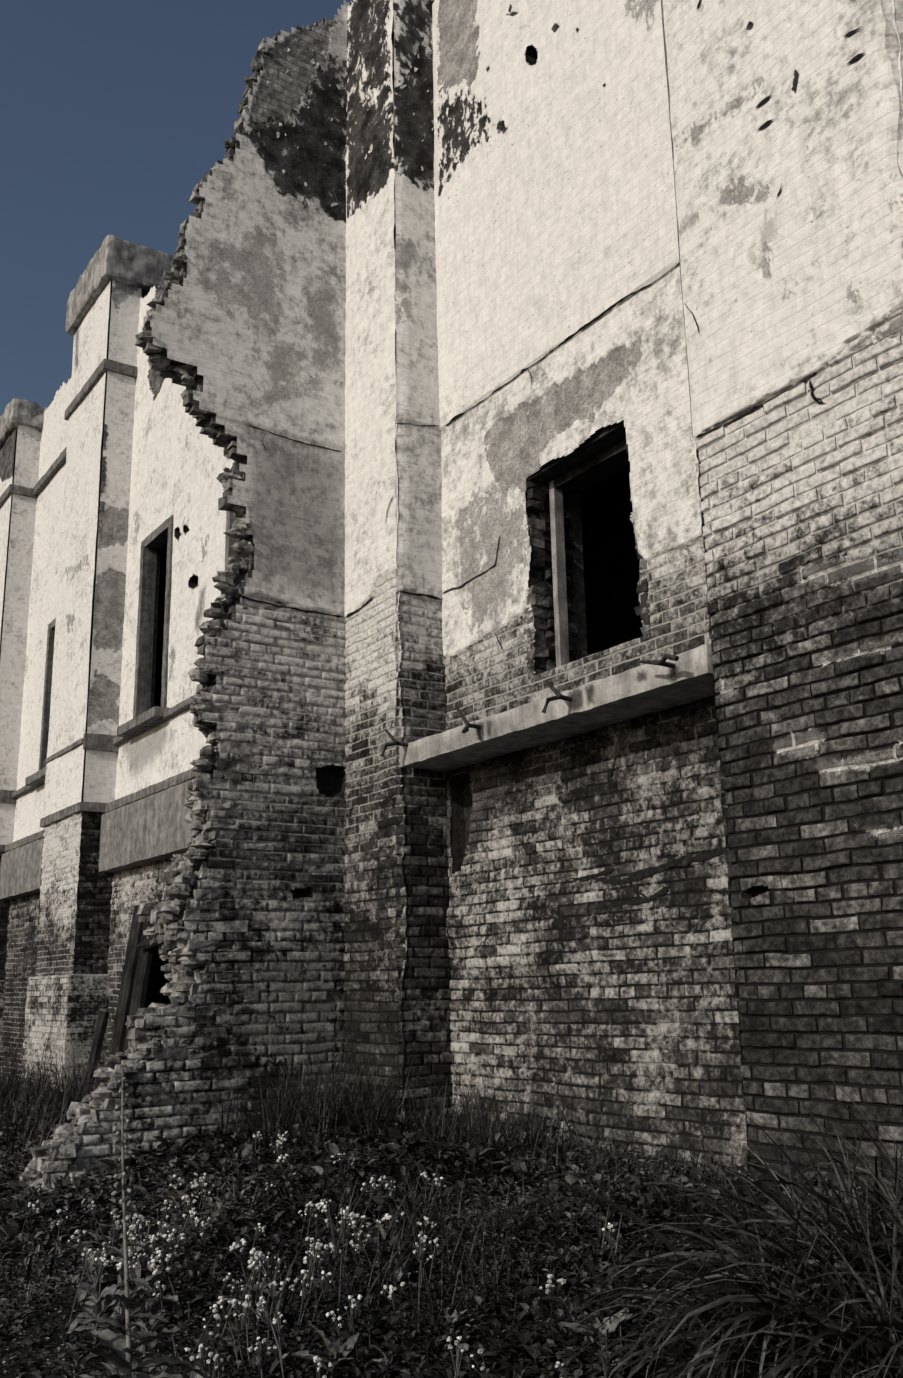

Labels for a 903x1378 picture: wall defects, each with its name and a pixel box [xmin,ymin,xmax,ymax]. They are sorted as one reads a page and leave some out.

spalling [524,44,538,66]
spalling [19,0,508,1197]
flaking render [456,338,642,635]
water stain [445,765,505,849]